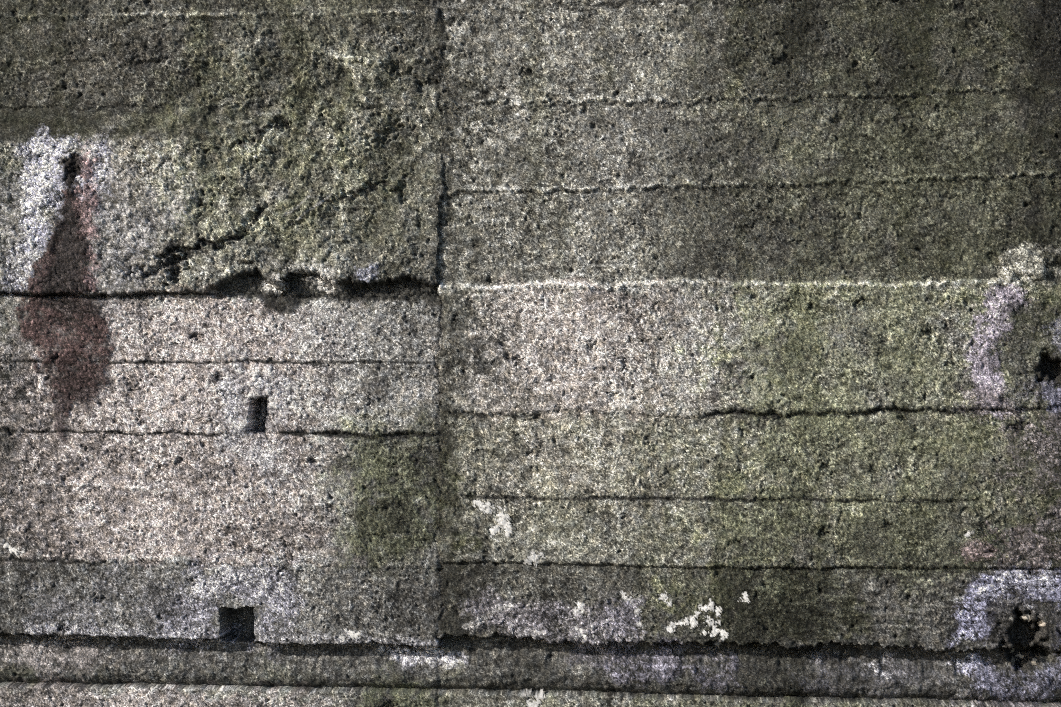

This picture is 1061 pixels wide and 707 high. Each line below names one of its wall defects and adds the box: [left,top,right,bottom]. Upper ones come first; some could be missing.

corrosion [15,153,121,442]
spalling [213,260,438,314]
leakage [965,283,1061,481]
leakage [463,595,738,689]
leakage [839,490,1061,707]